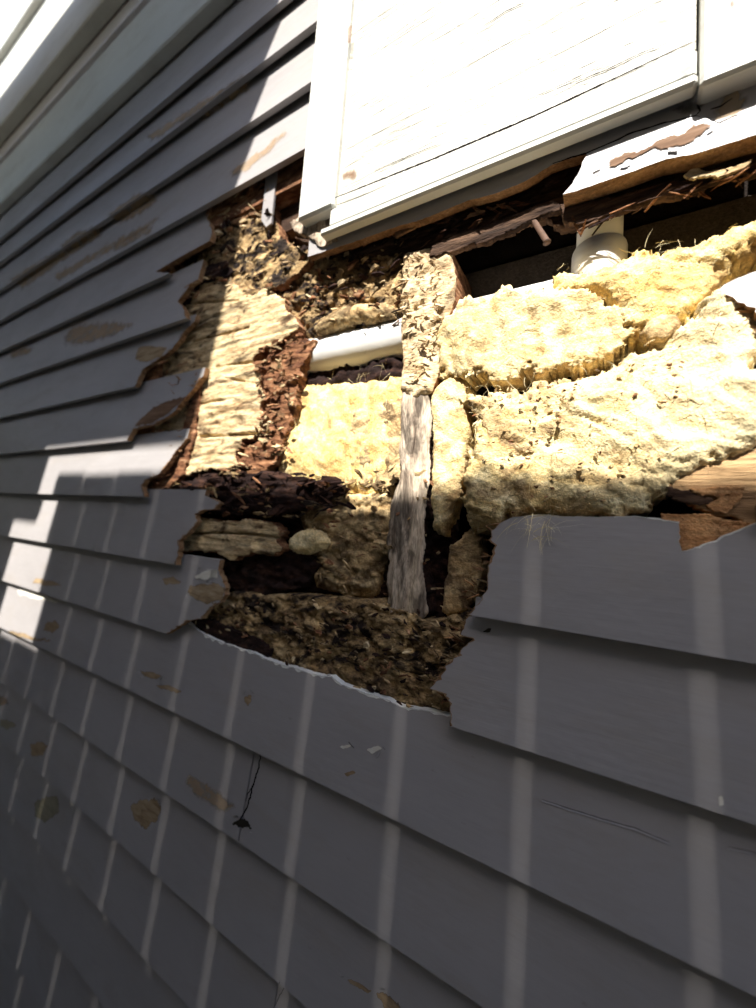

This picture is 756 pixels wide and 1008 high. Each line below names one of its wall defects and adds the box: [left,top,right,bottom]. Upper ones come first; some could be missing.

peeling [584,121,713,183]
peeling [134,397,184,427]
peeling [163,568,225,604]
crack [240,756,261,819]
peeling [131,797,161,829]